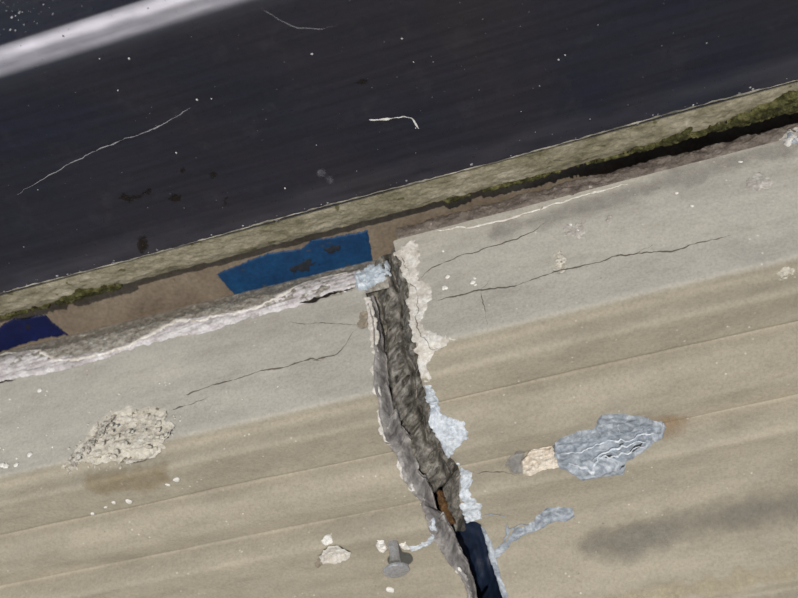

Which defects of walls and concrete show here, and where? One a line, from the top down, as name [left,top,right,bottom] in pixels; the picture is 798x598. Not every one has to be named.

crack [300,288,353,303]
crack [401,222,546,350]
crack [441,235,729,312]
crack [173,322,355,410]
spalling [61,405,176,474]
rust [437,490,456,525]